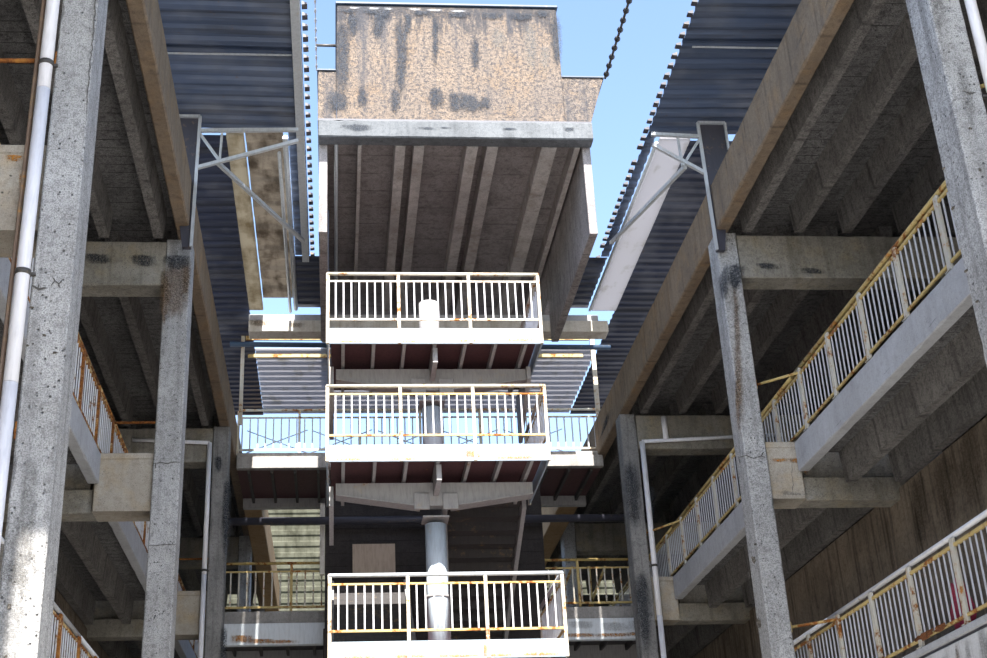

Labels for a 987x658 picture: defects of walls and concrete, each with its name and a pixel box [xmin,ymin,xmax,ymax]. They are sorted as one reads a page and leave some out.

water stain [329,9,390,110]
water stain [392,11,438,111]
water stain [430,88,489,111]
water stain [483,11,561,62]